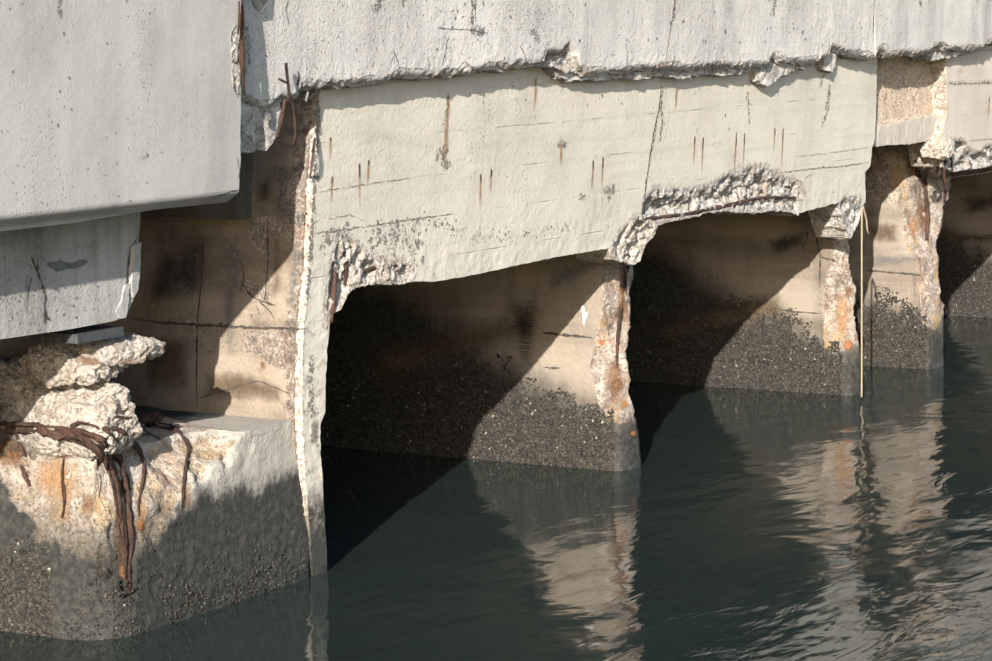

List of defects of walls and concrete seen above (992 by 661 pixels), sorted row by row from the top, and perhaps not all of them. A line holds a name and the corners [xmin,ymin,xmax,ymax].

spalling [230,0,992,147]
spalling [326,237,415,327]
crack [644,91,661,201]
spalling [595,166,805,368]
spalling [813,196,864,240]
spalling [914,140,992,241]
rust [608,366,627,407]
spalling [0,416,191,594]